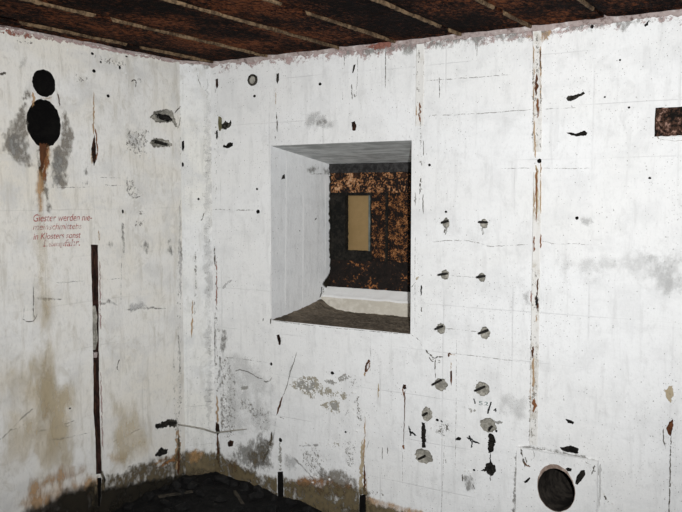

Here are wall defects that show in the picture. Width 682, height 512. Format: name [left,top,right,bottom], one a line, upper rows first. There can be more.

corrosion [305,38,460,78]
leakage [3,92,30,166]
corrosion [37,143,50,211]
leakage [52,114,74,188]
spalling [150,109,182,129]
corrosion [472,23,605,219]
crack [273,352,297,437]
peeling [289,374,366,433]
corrosion [528,333,538,437]
leakage [27,433,421,512]